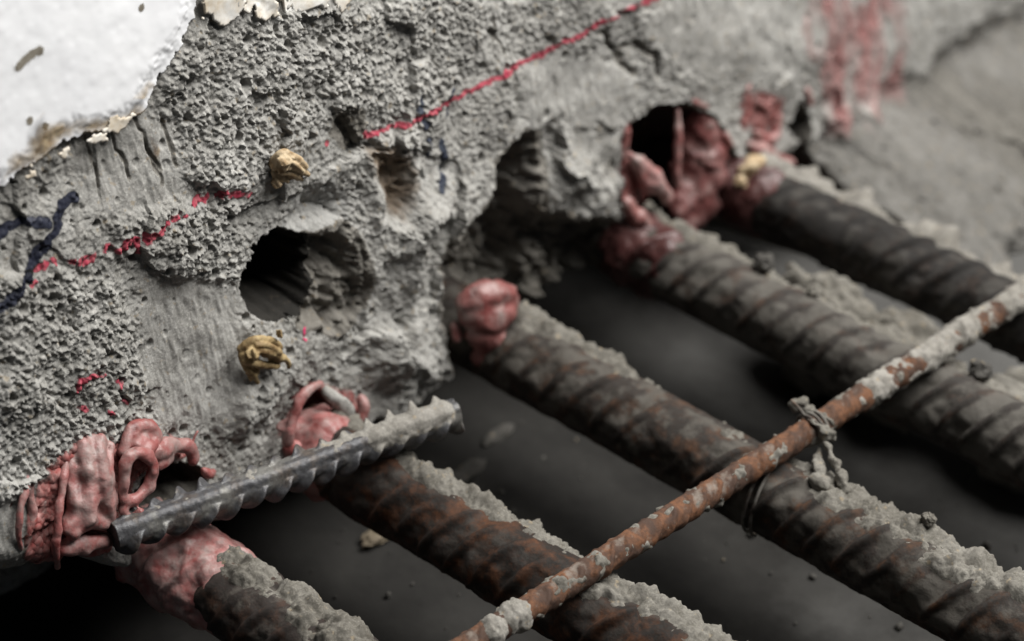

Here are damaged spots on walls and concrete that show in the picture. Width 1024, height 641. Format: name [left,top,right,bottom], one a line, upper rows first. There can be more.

crack [487,12,508,58]
crack [596,29,661,79]
peeling [86,112,136,145]
spalling [112,0,487,284]
spalling [780,0,1024,266]
spalling [646,195,668,211]